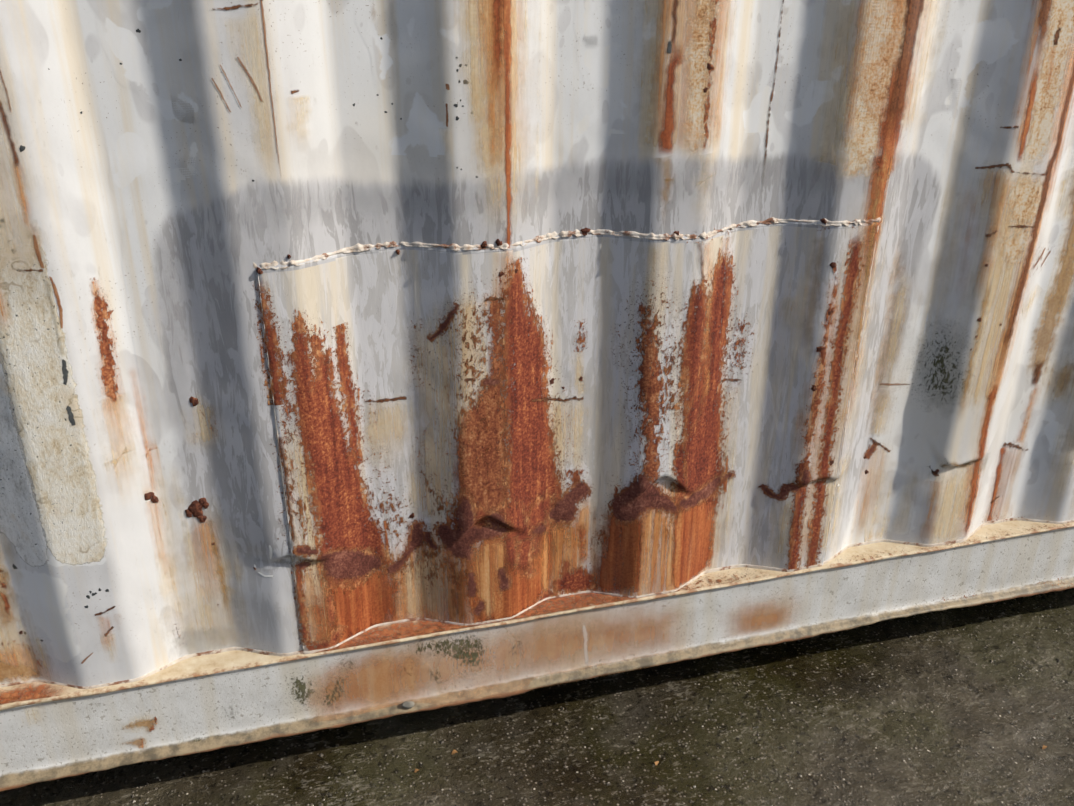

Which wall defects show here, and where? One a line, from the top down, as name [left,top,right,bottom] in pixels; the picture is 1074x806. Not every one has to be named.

peeling [0,240,115,668]
corrosion [90,279,118,402]
corrosion [255,0,757,653]
corrosion [758,0,924,570]
corrosion [963,0,1074,542]